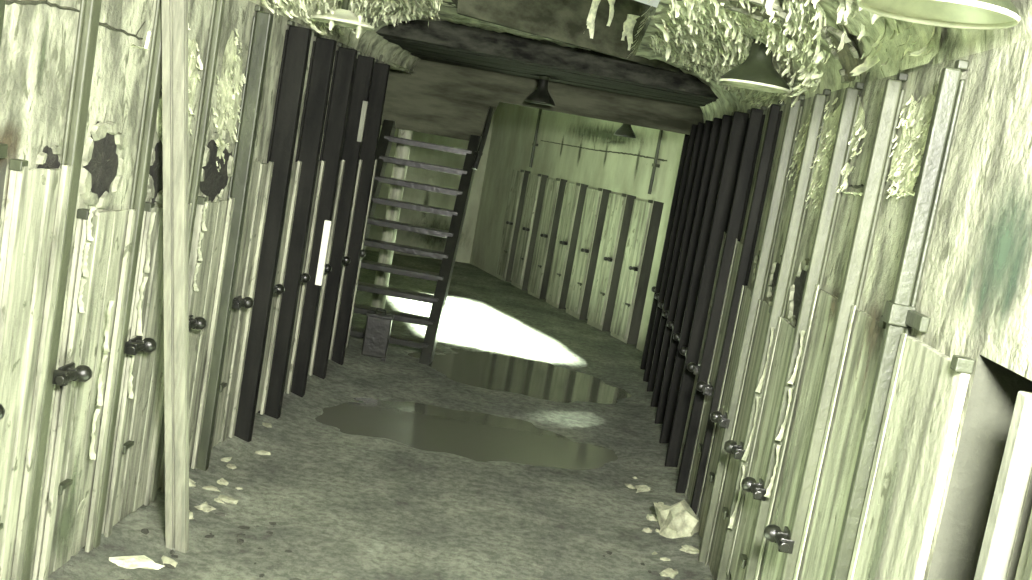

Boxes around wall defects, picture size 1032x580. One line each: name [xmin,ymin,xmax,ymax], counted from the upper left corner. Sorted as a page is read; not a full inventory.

crack [5,0,151,50]
flaking render [262,0,443,35]
flaking render [628,0,941,108]
spalling [36,145,62,185]
spalling [78,121,128,313]
spalling [135,89,163,336]
flaking render [193,28,246,291]
flaking render [786,95,868,209]
flaking render [886,93,936,199]
peeling [88,301,114,460]
peeling [727,328,775,530]
spalling [764,255,810,499]